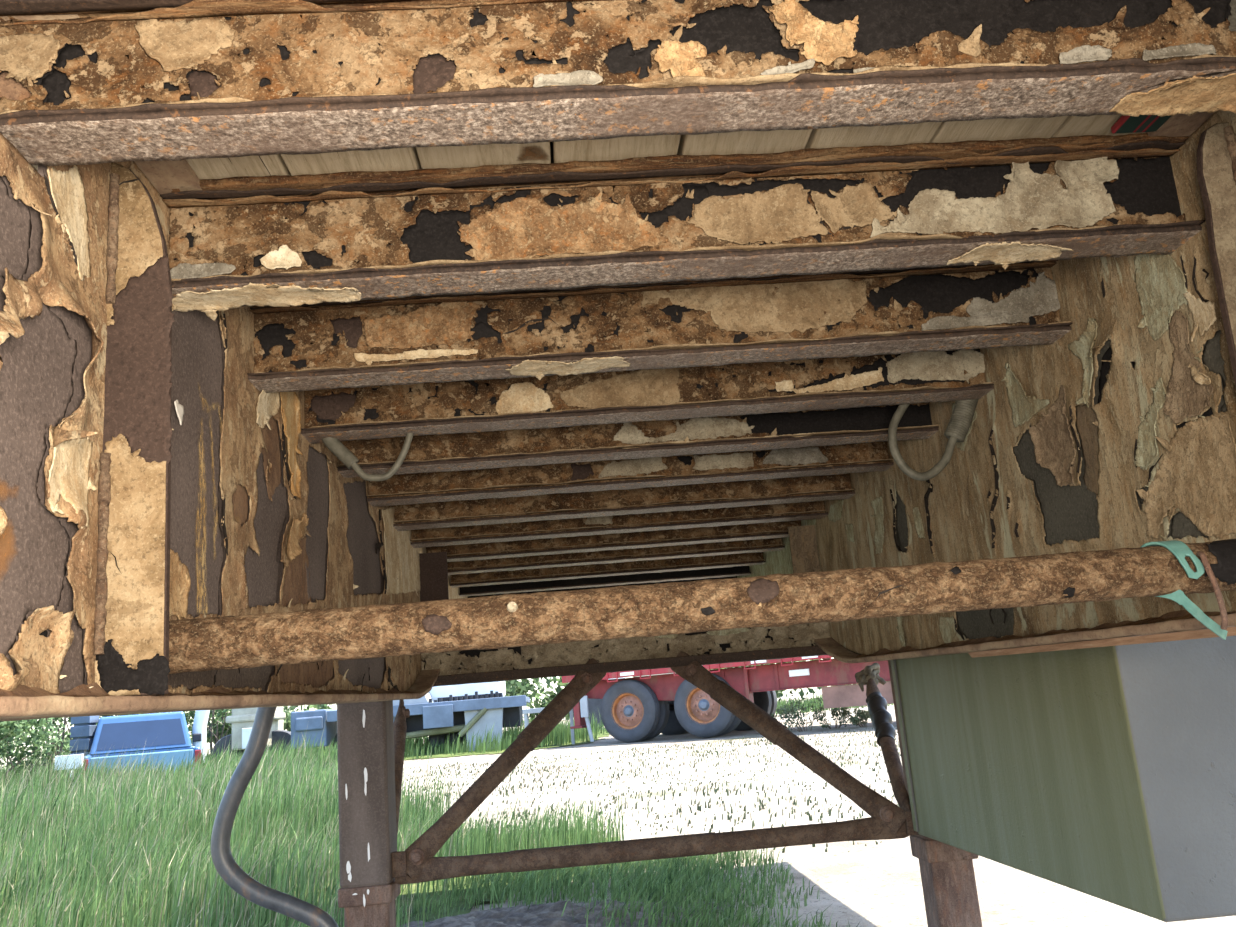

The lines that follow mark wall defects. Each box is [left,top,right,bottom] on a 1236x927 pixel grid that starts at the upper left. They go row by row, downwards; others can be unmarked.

peeling [0,33,90,105]
peeling [134,17,236,99]
peeling [604,0,815,79]
peeling [799,0,1236,73]
corrosion [1109,73,1236,117]
peeling [0,165,91,281]
peeling [252,245,333,270]
peeling [401,207,472,263]
peeling [639,156,1182,245]
peeling [868,271,1060,331]
peeling [0,256,421,695]
peeling [571,404,932,481]